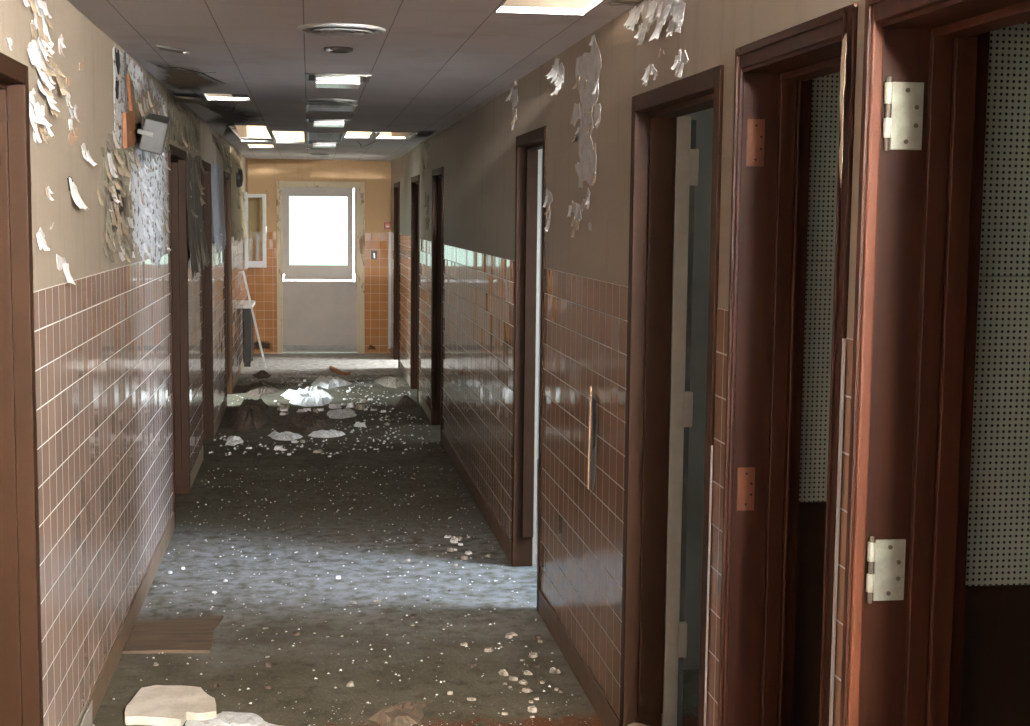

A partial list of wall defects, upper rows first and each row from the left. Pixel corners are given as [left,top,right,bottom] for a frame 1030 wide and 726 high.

peeling [23,0,247,285]
peeling [543,35,601,237]
peeling [623,0,689,86]